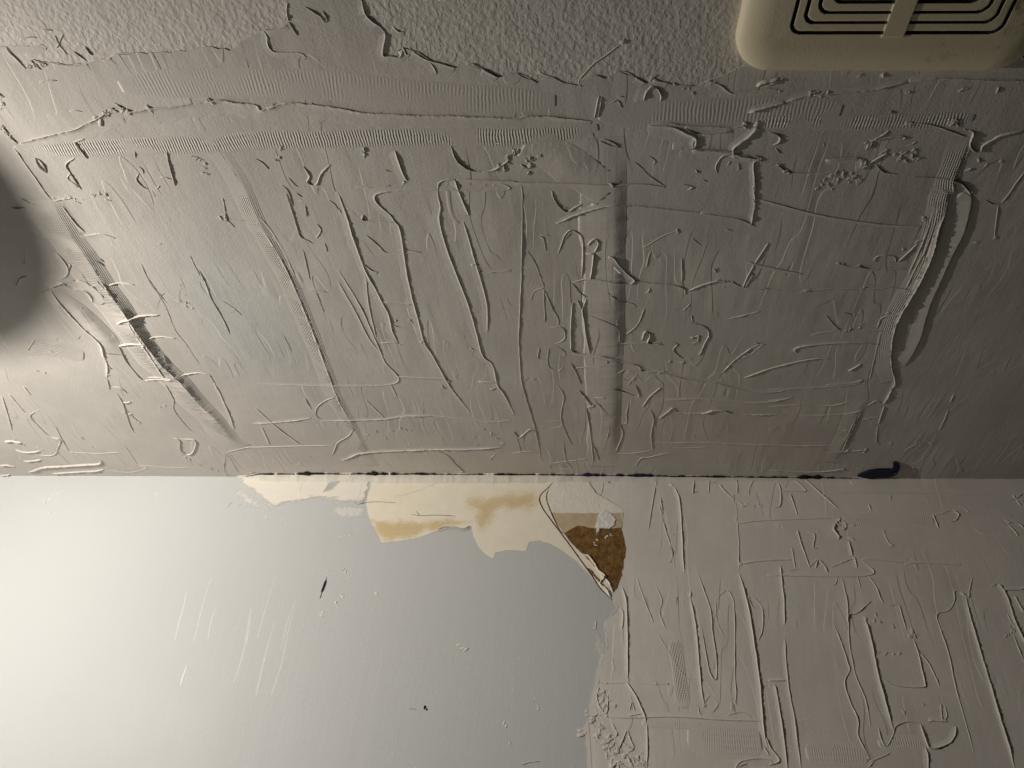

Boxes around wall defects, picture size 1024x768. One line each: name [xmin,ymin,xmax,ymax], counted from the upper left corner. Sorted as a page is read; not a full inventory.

peeling [242,478,612,598]